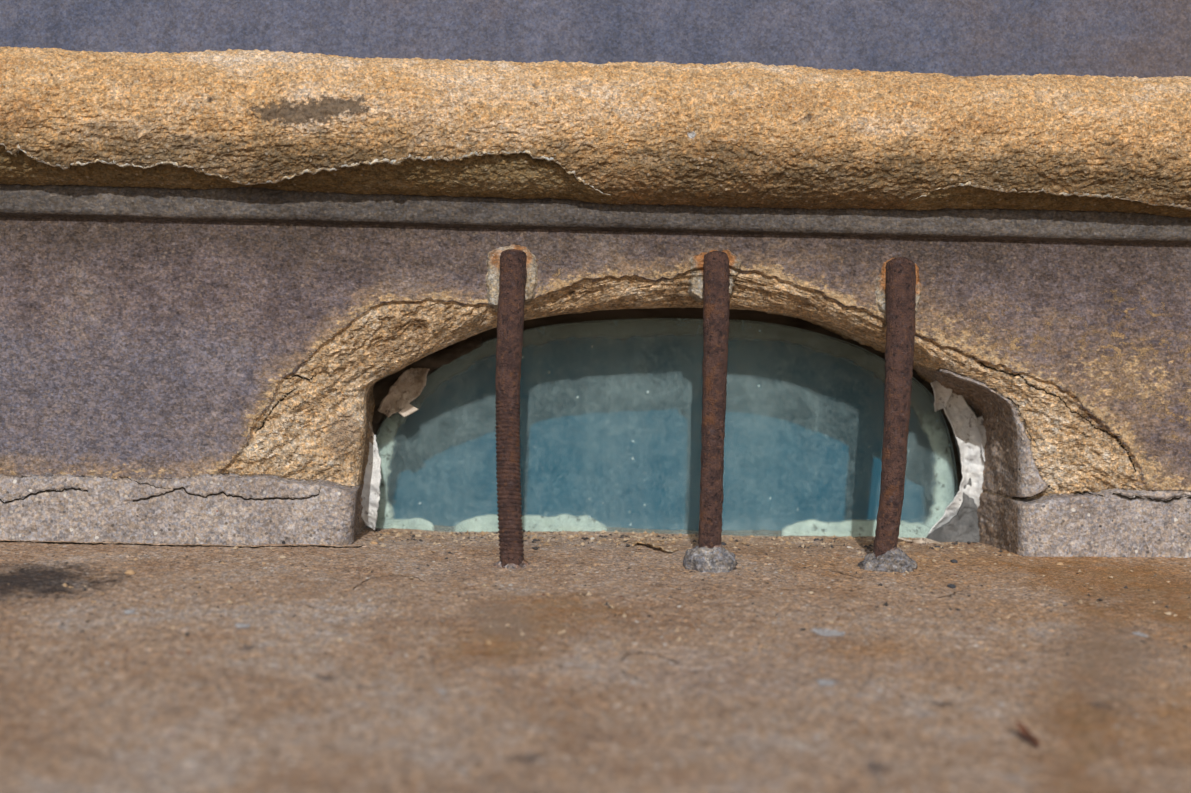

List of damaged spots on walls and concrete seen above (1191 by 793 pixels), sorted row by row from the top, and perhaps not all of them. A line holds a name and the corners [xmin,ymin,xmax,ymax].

leakage [246,95,369,127]
spalling [524,269,703,321]
spalling [729,270,886,351]
spalling [218,297,498,530]
spalling [913,333,1152,536]
crack [980,362,1191,503]
crack [0,487,88,503]
crack [119,476,321,501]
leakage [0,563,121,601]